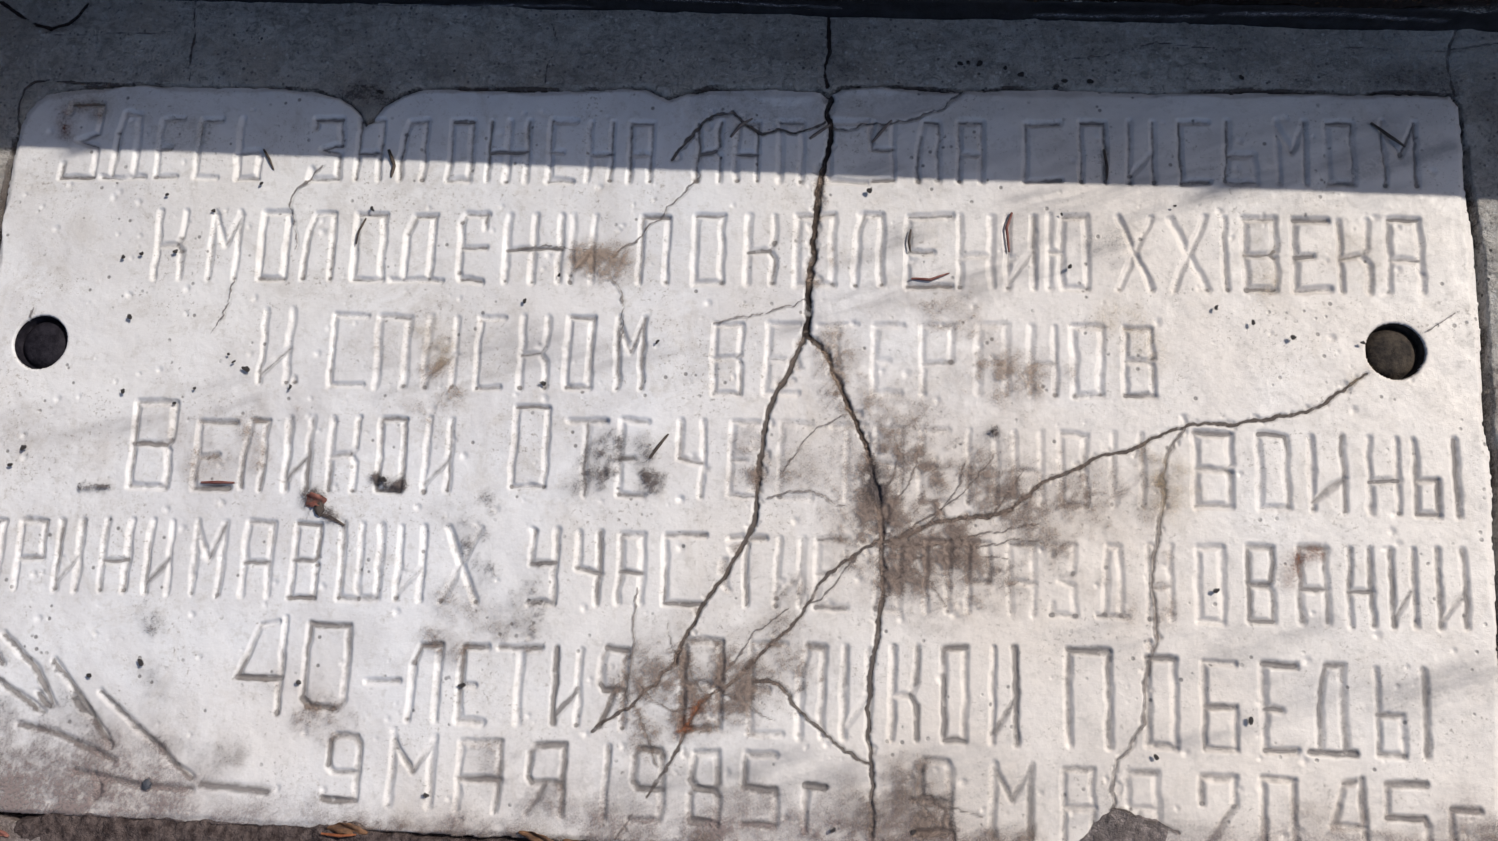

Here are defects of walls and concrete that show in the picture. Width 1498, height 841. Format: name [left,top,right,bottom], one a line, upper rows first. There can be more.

crack [519,18,1368,841]